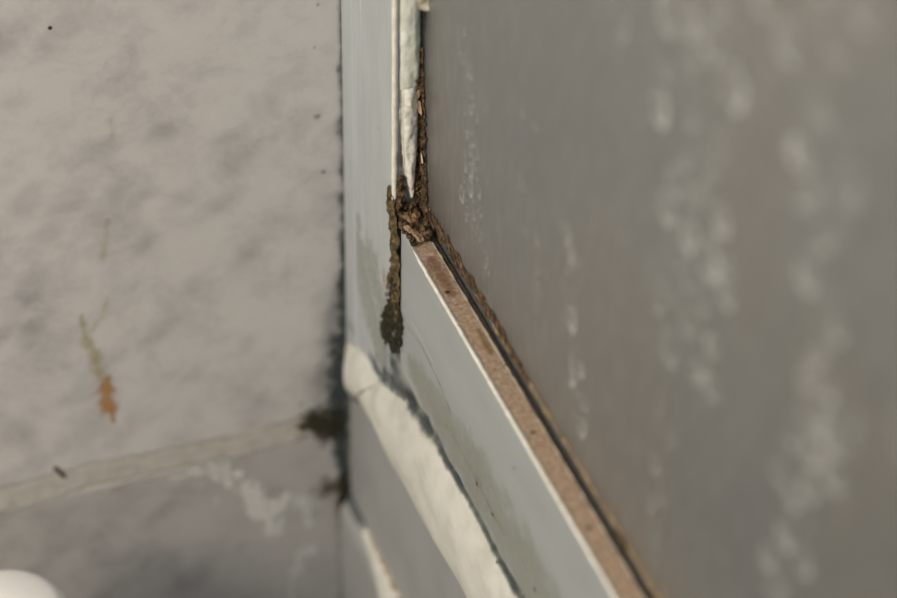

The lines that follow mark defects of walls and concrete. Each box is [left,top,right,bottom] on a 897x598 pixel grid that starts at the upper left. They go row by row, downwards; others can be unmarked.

rust [101,377,116,423]
leakage [168,460,314,537]
leakage [297,194,367,528]
leakage [369,10,661,598]